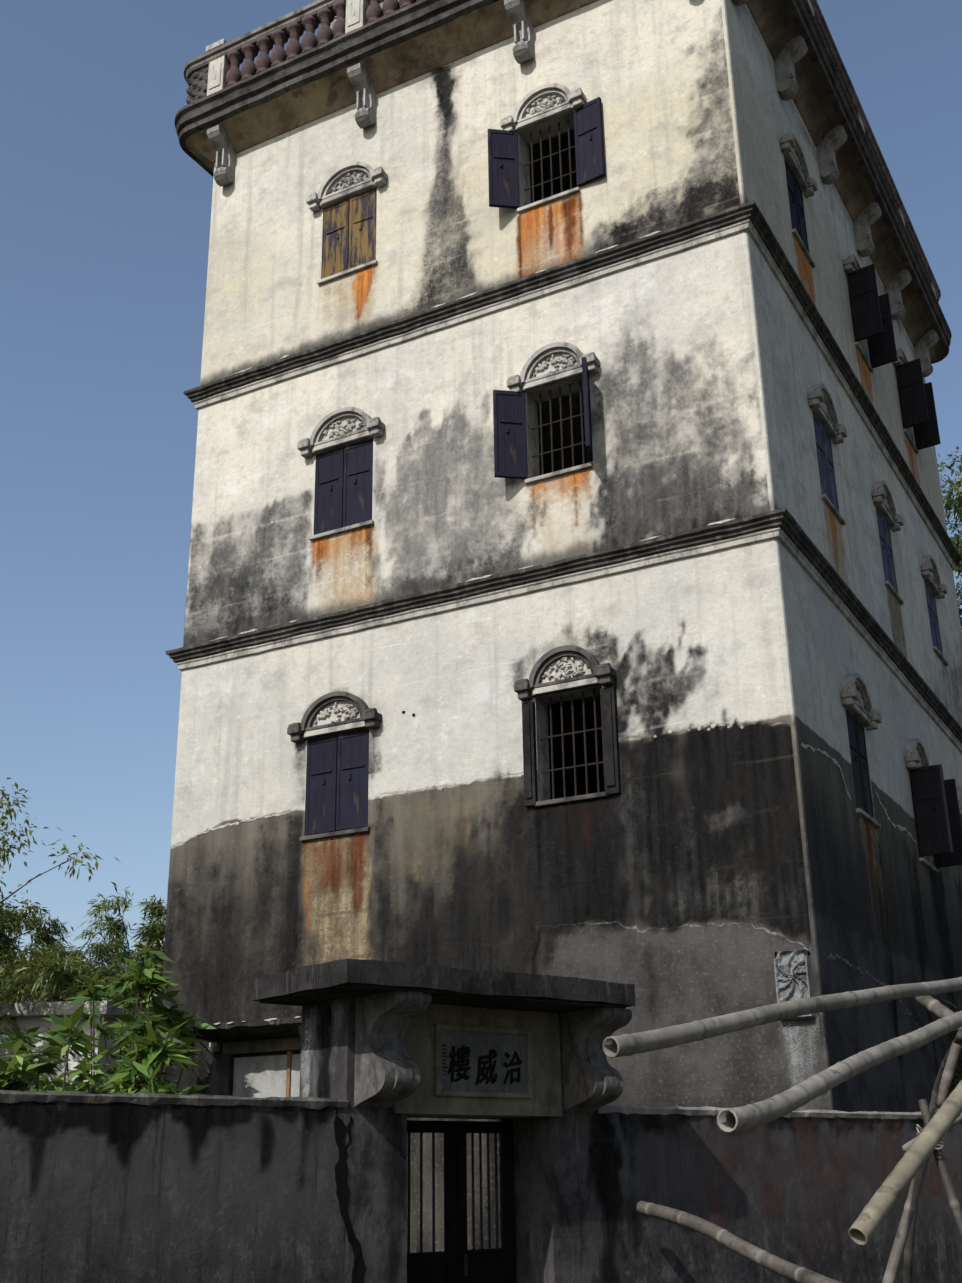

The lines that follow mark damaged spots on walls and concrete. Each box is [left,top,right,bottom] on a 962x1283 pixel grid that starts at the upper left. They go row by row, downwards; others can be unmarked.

corrosion [338,267,373,317]
damp [417,66,475,309]
corrosion [517,194,583,277]
damp [592,37,740,252]
damp [183,491,311,647]
corrosion [312,526,378,605]
corrosion [560,469,590,491]
damp [590,344,770,552]
damp [378,631,811,973]
corrosion [301,826,372,963]
damp [0,1006,334,1192]
crack [334,1099,366,1283]